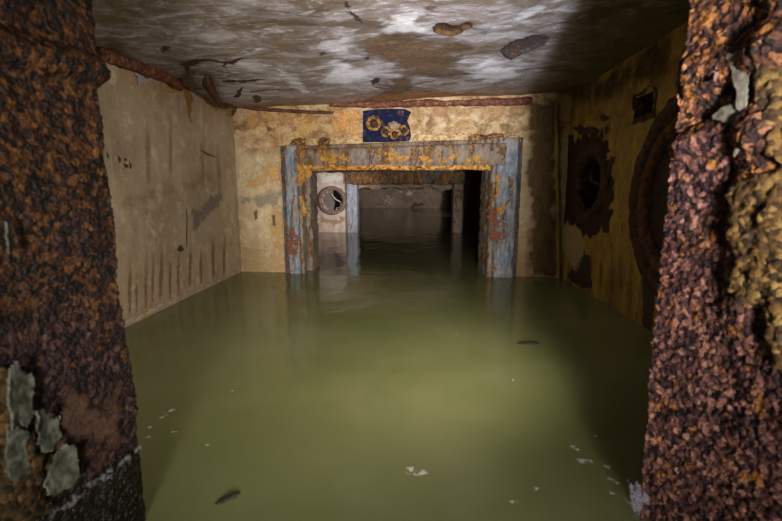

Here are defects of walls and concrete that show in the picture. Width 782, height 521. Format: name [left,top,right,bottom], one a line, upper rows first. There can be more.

crack [178,58,266,98]
rust [364,91,524,118]
spalling [501,34,550,60]
peeling [712,51,750,124]
rust [269,212,300,261]
rust [296,149,506,244]
rust [723,64,782,373]
rust [642,276,654,331]
peeling [0,360,82,521]
rust [60,382,122,471]